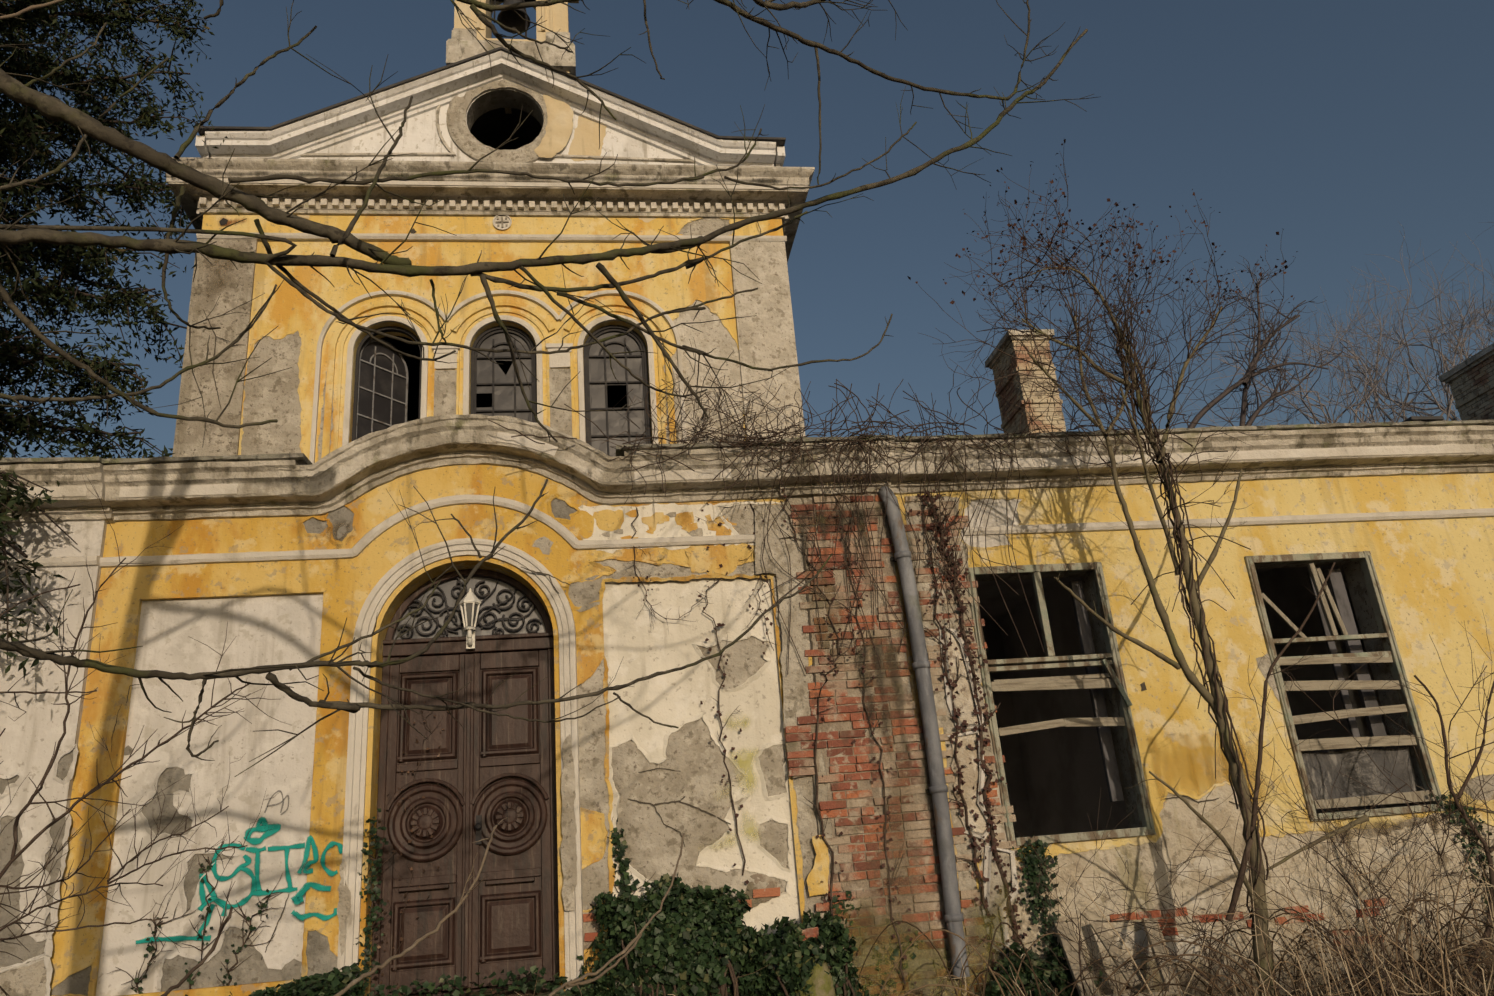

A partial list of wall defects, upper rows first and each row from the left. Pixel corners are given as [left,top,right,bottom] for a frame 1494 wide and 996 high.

peeling [675,217,736,236]
peeling [238,329,334,461]
peeling [661,298,747,444]
peeling [532,537,554,555]
peeling [52,744,79,785]
peeling [547,493,1494,996]
flaking render [0,769,97,996]
peeling [138,763,241,918]
peeling [157,860,351,992]